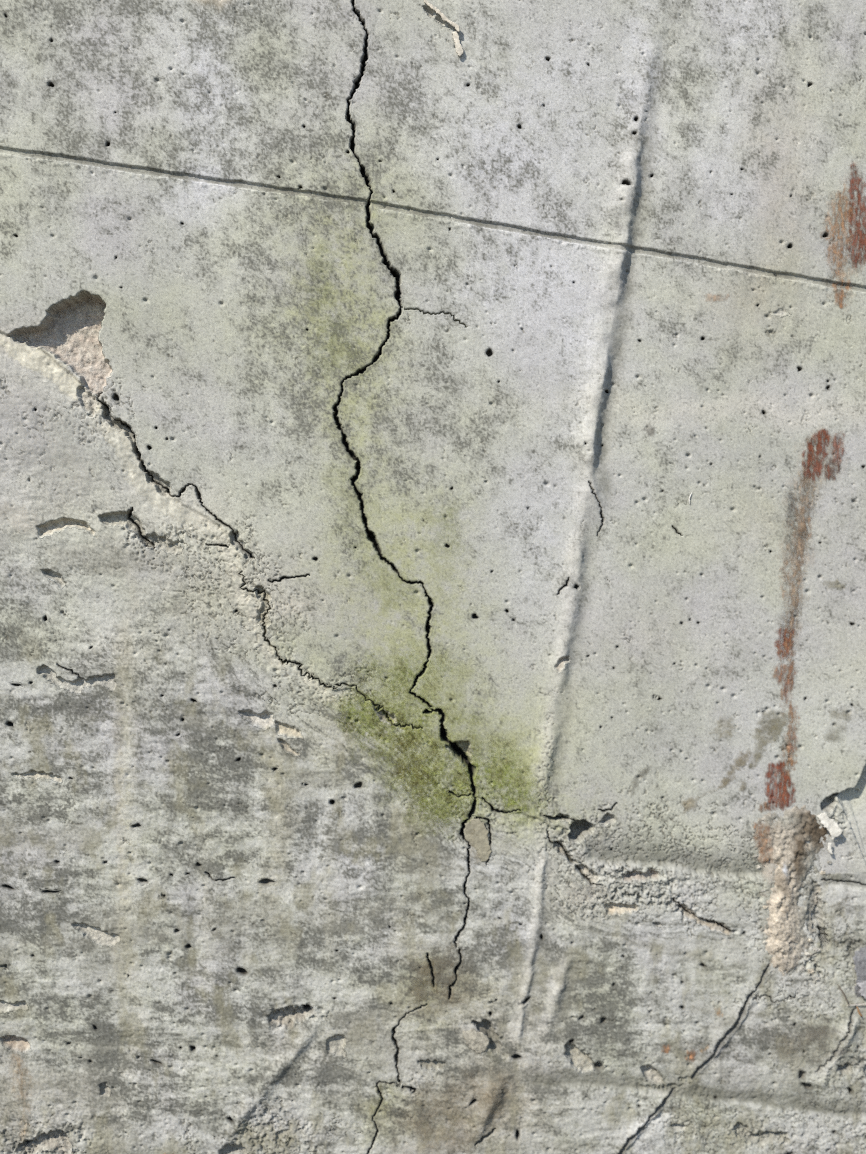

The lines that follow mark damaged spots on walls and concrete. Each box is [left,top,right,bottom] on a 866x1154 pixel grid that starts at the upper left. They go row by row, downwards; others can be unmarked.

rust [827,164,866,308]
spalling [8,290,171,497]
rust [802,429,844,487]
crack [95,0,618,1154]
crack [56,663,83,680]
rust [754,509,810,861]
peeling [817,797,842,855]
spalling [807,882,832,980]
crack [616,963,798,1154]